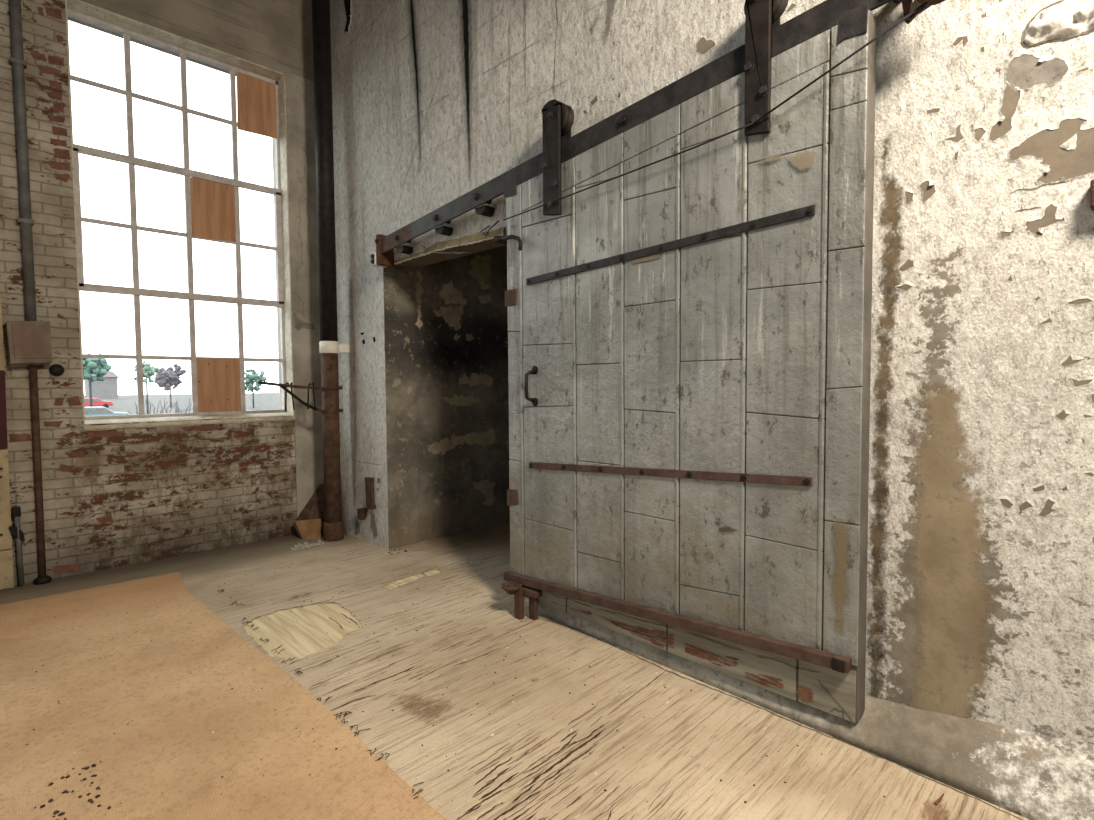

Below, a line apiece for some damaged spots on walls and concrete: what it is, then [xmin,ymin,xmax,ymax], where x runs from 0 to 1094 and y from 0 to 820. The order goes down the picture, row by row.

crack [509,25,526,137]
crack [551,0,559,100]
peeling [939,30,1094,185]
peeling [903,178,939,207]
peeling [998,201,1067,241]
peeling [1031,292,1094,326]
flaking render [43,420,125,473]
leakage [867,138,904,699]
peeling [880,243,972,706]
peeling [1052,353,1094,422]
leakage [905,381,999,718]
peeling [959,483,1071,680]